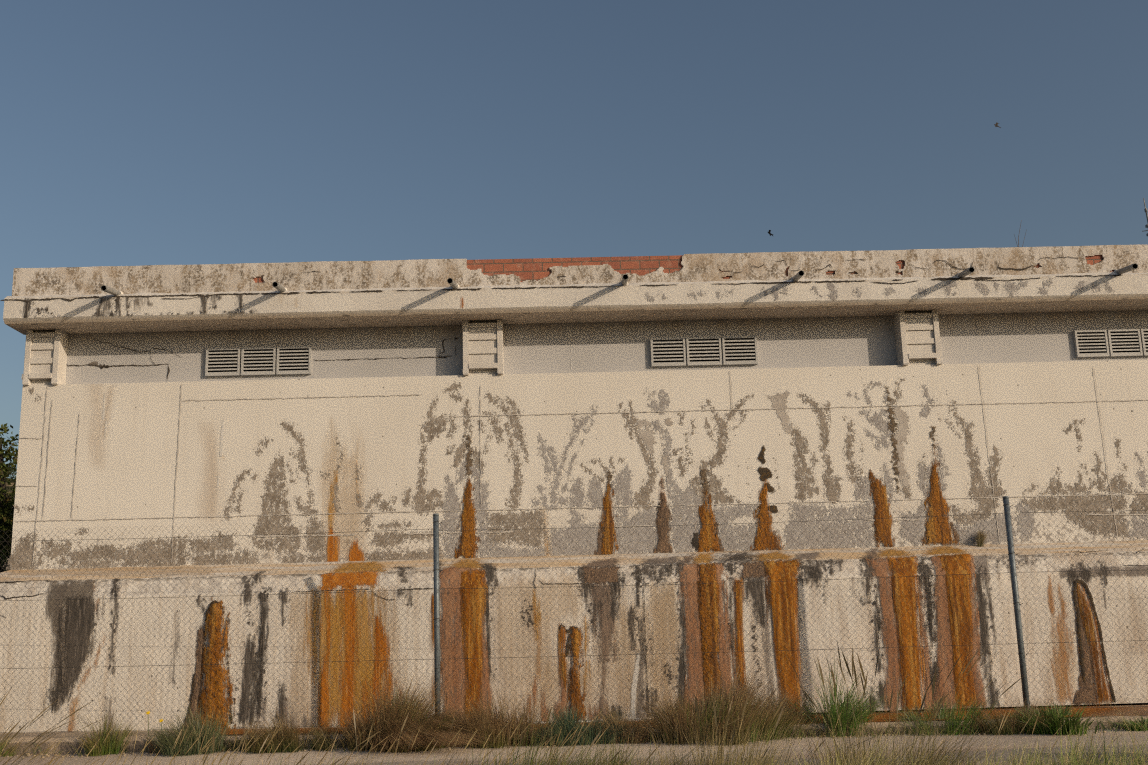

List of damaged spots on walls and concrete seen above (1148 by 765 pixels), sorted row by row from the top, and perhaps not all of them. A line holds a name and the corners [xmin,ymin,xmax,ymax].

crack [67,338,181,380]
spalling [467,255,683,282]
leakage [46,577,120,713]
rust [182,594,269,735]
leakage [233,571,311,729]
rust [293,436,401,734]
rust [431,434,498,721]
leakage [575,475,681,721]
rust [675,469,747,711]
rust [746,445,829,724]
rust [850,425,1148,722]
leakage [1060,555,1148,607]